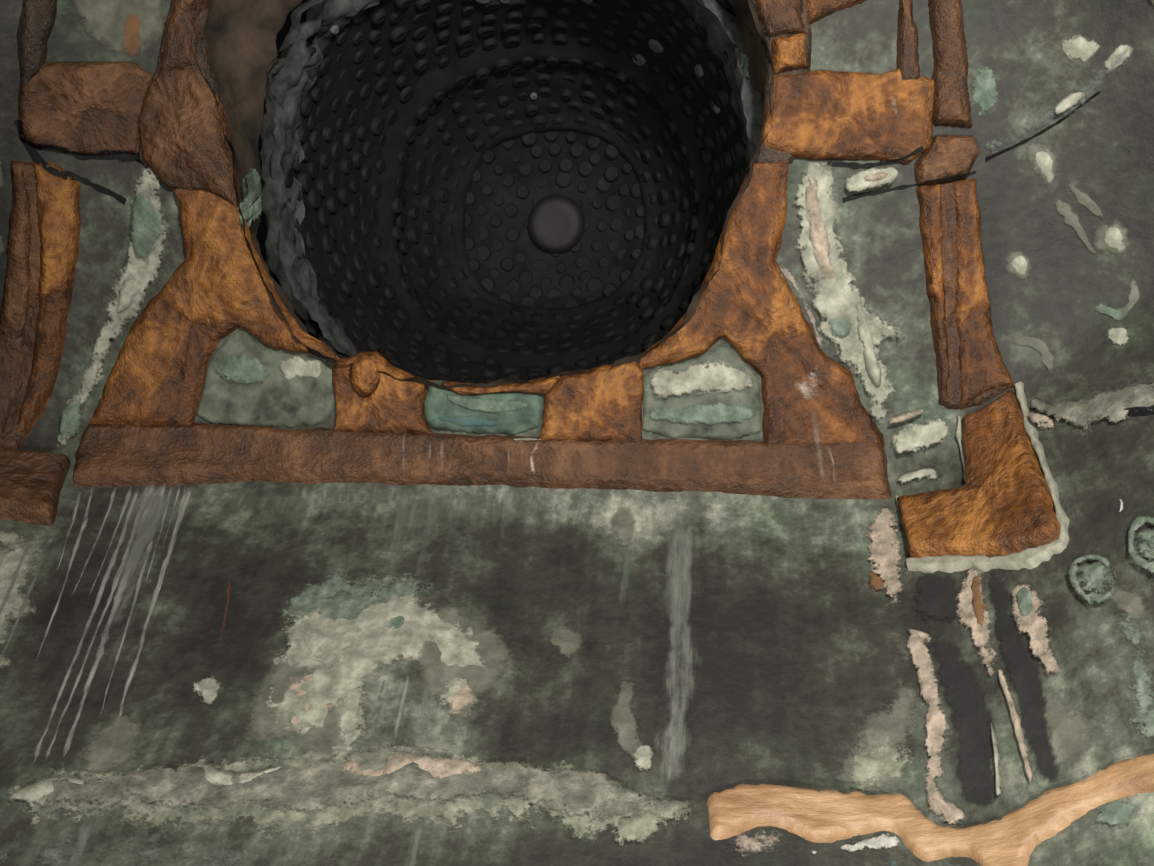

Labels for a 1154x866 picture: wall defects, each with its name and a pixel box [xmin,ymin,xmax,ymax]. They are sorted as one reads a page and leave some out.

crack [14,119,141,205]
crack [827,91,1100,202]
leakage [58,496,91,589]
leakage [86,488,190,660]
leakage [51,648,103,727]
leakage [85,648,141,772]
leakage [666,530,692,776]